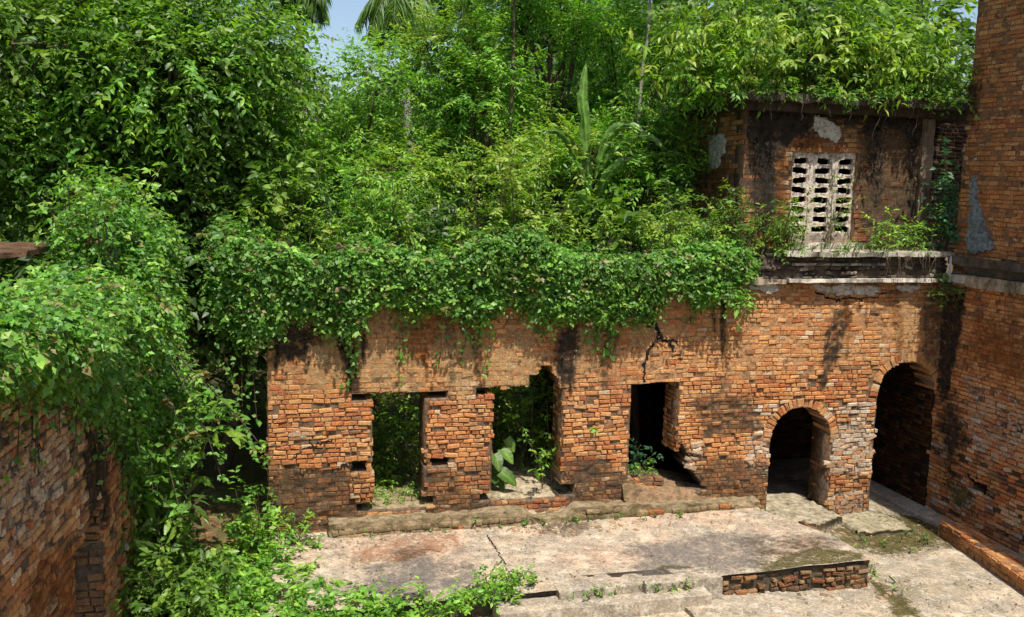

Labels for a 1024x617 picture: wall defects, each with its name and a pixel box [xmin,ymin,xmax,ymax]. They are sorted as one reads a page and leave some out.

peeling [811,115,842,143]
peeling [707,133,729,200]
damp [746,110,922,244]
peeling [966,175,994,254]
crack [642,321,683,383]